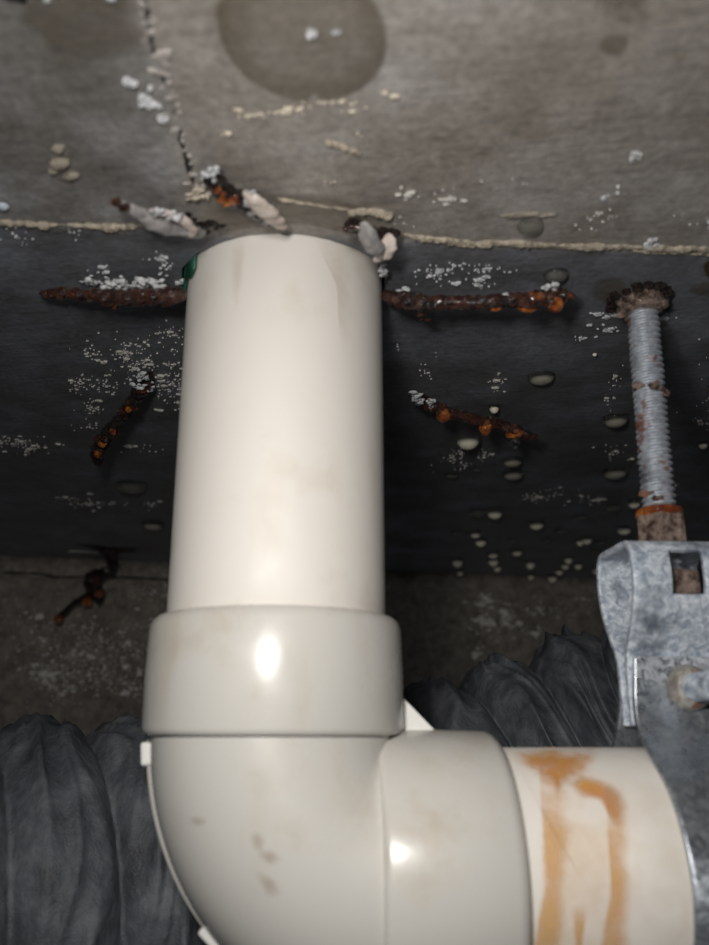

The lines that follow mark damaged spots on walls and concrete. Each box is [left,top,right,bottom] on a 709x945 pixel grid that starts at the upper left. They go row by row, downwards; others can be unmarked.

damp [306,28,318,40]
damp [226,42,375,120]
crack [138,0,209,202]
peeling [148,208,198,238]
peeling [243,191,287,230]
peeling [373,233,397,263]
damp [68,320,183,431]
damp [408,390,436,409]
damp [0,436,65,456]
crack [68,544,169,580]
corrosion [53,549,120,624]